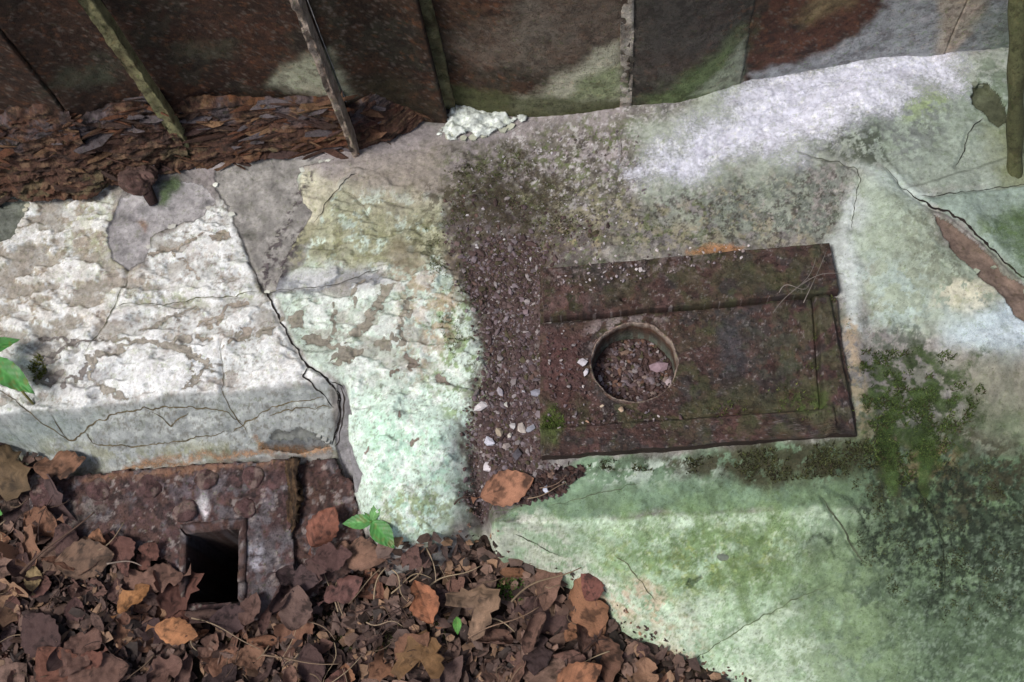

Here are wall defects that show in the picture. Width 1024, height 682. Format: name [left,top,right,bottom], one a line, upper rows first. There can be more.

crack [801,152,861,227]
crack [885,119,1024,278]
spalling [934,215,1024,321]
crack [1,250,382,502]